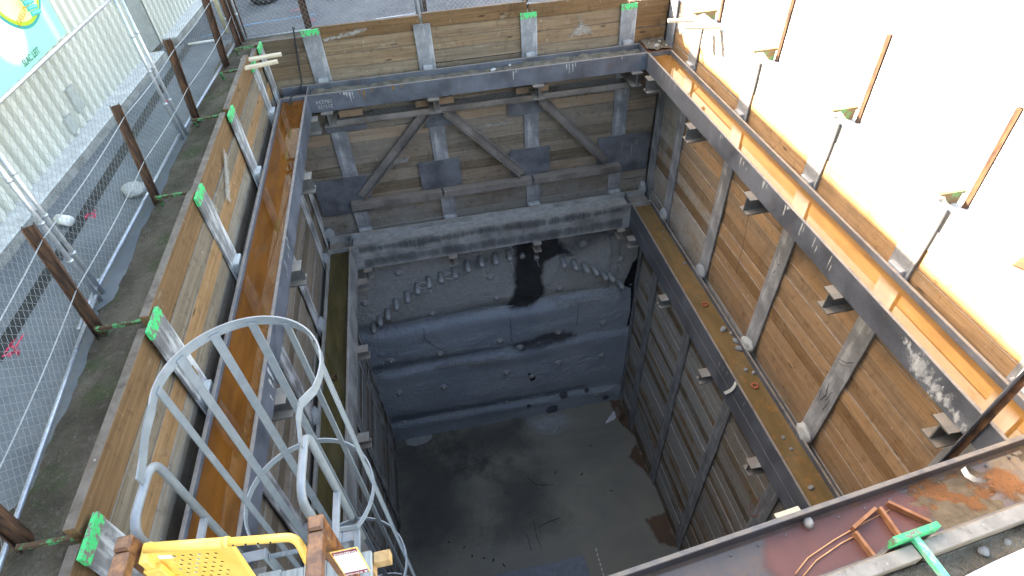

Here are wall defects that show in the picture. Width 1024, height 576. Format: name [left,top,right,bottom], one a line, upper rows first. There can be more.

leakage [508,238,569,308]
leakage [513,332,576,351]
rust [767,467,1024,576]